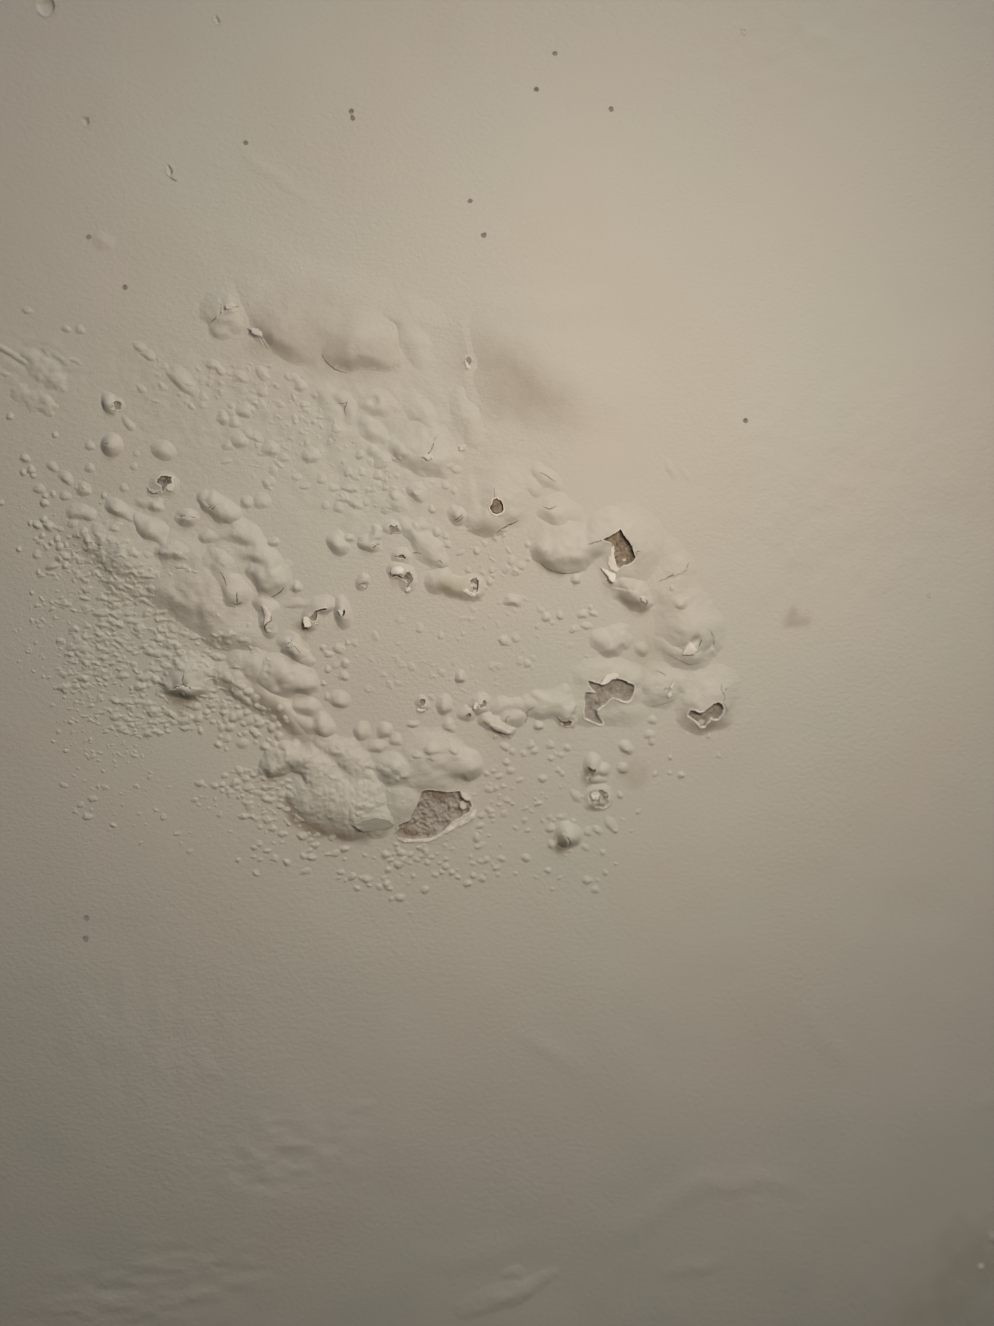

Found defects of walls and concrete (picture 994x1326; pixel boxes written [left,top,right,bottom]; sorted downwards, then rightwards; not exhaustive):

peeling [527,503,667,582]
peeling [572,656,650,728]
peeling [674,663,741,735]
peeling [374,726,485,847]